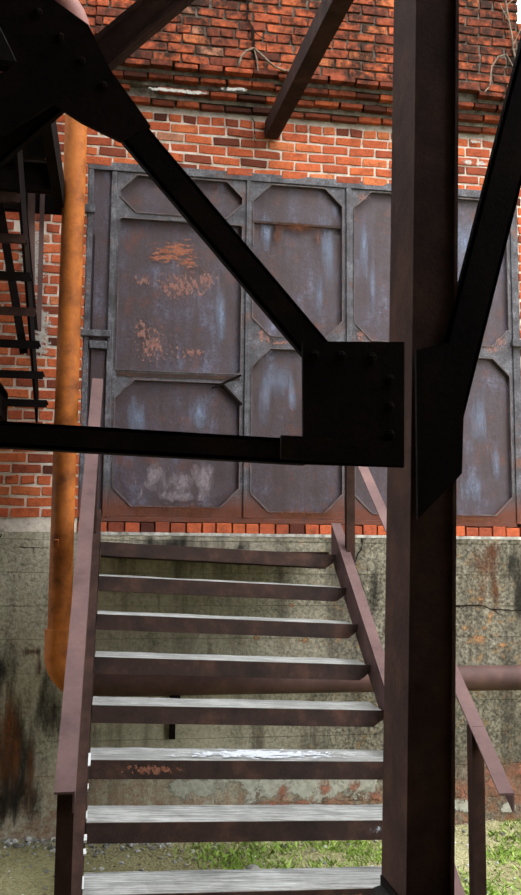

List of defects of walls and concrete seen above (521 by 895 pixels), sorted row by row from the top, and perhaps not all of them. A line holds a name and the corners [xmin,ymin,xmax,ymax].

crack [456,604,516,615]
water stain [40,677,60,730]
water stain [0,704,36,819]
corrosion [117,764,182,775]